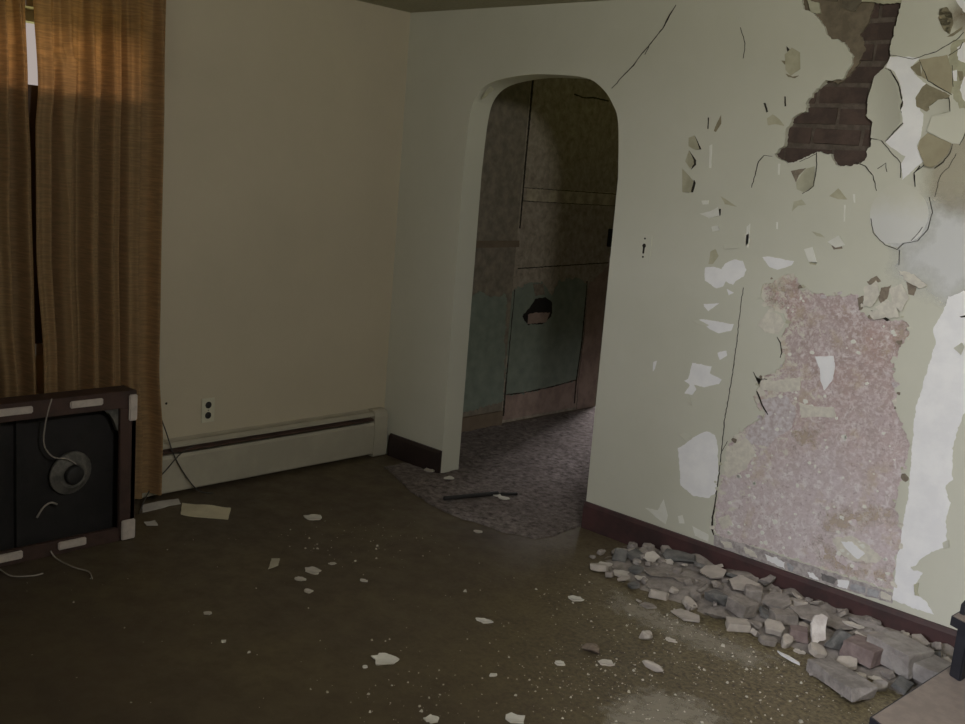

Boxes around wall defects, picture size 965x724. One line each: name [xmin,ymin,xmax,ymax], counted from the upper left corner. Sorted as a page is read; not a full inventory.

crack [574,5,676,102]
peeling [682,135,712,192]
flaking render [764,0,965,211]
peeling [463,257,610,420]
crack [711,287,768,535]
flaking render [646,204,965,614]